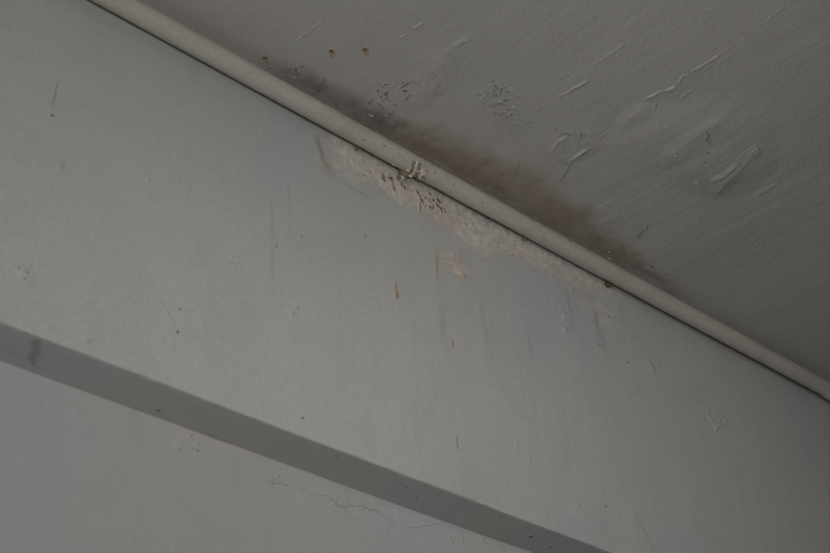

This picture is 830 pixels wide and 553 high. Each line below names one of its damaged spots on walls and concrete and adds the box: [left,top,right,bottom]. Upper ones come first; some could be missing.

spalling [357,171,455,224]
leakage [328,132,622,295]